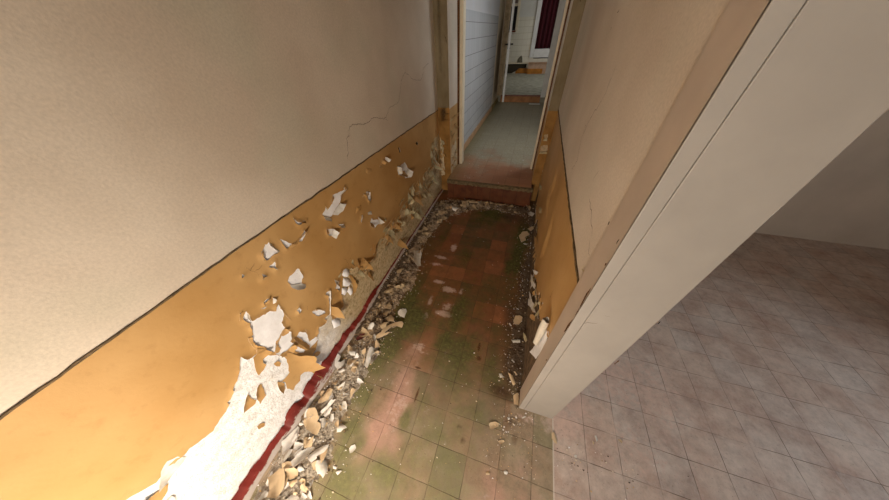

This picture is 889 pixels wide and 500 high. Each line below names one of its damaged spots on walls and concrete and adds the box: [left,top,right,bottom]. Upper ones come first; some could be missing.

peeling [127,114,459,500]